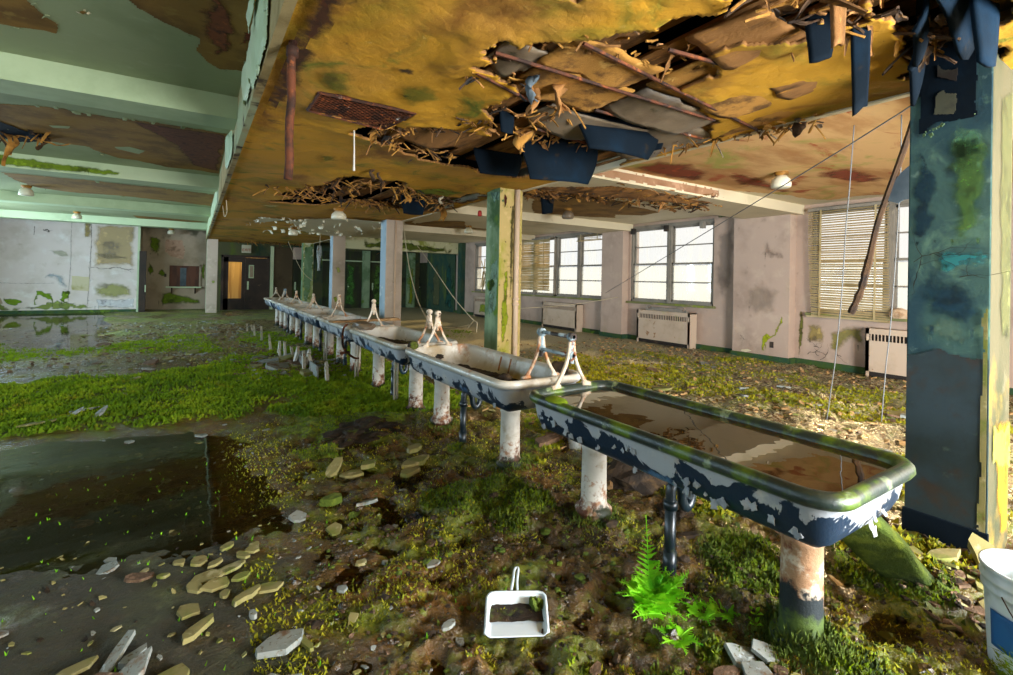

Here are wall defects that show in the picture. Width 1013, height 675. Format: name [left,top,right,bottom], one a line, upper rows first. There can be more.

peeling [0,0,58,34]
peeling [127,0,268,108]
rust [263,0,343,114]
peeling [0,104,233,174]
peeling [531,41,978,218]
peeling [2,172,218,237]
leakage [85,223,134,264]
leakage [97,284,134,307]